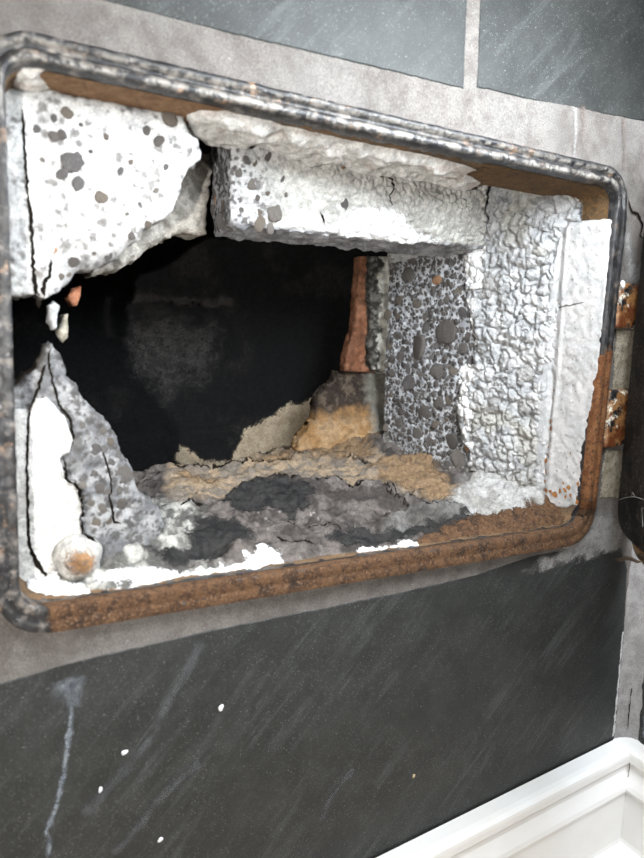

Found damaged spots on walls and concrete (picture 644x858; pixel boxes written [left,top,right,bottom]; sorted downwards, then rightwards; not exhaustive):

crack [21,110,53,308]
crack [25,348,97,576]
crack [101,449,121,524]
corrosion [40,346,613,633]
spalling [339,254,477,469]
efflorescence [45,681,79,855]